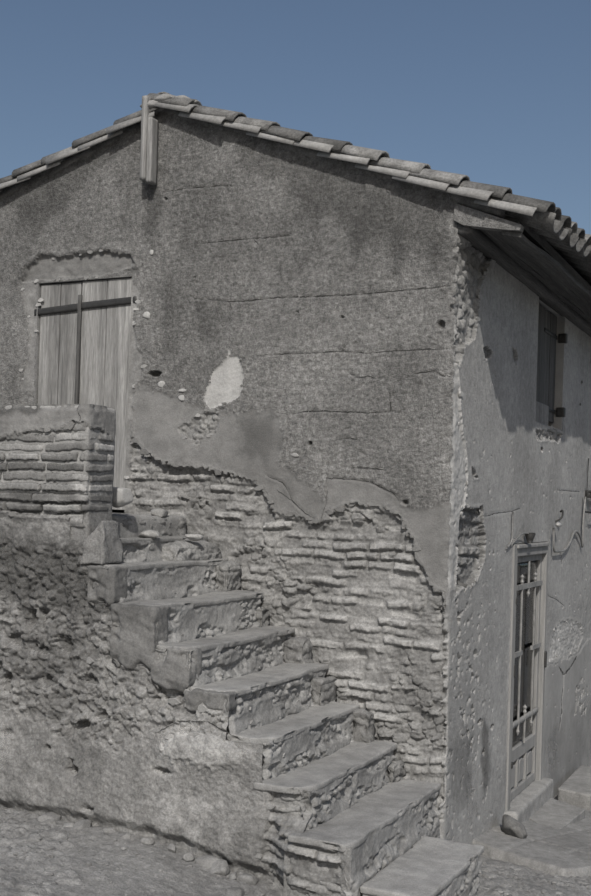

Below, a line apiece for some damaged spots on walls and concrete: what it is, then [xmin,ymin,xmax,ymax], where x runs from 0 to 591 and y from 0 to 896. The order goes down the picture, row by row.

crack [195,285,450,311]
crack [263,344,451,377]
crack [294,374,391,414]
spalling [0,238,496,896]
peeling [549,619,583,662]